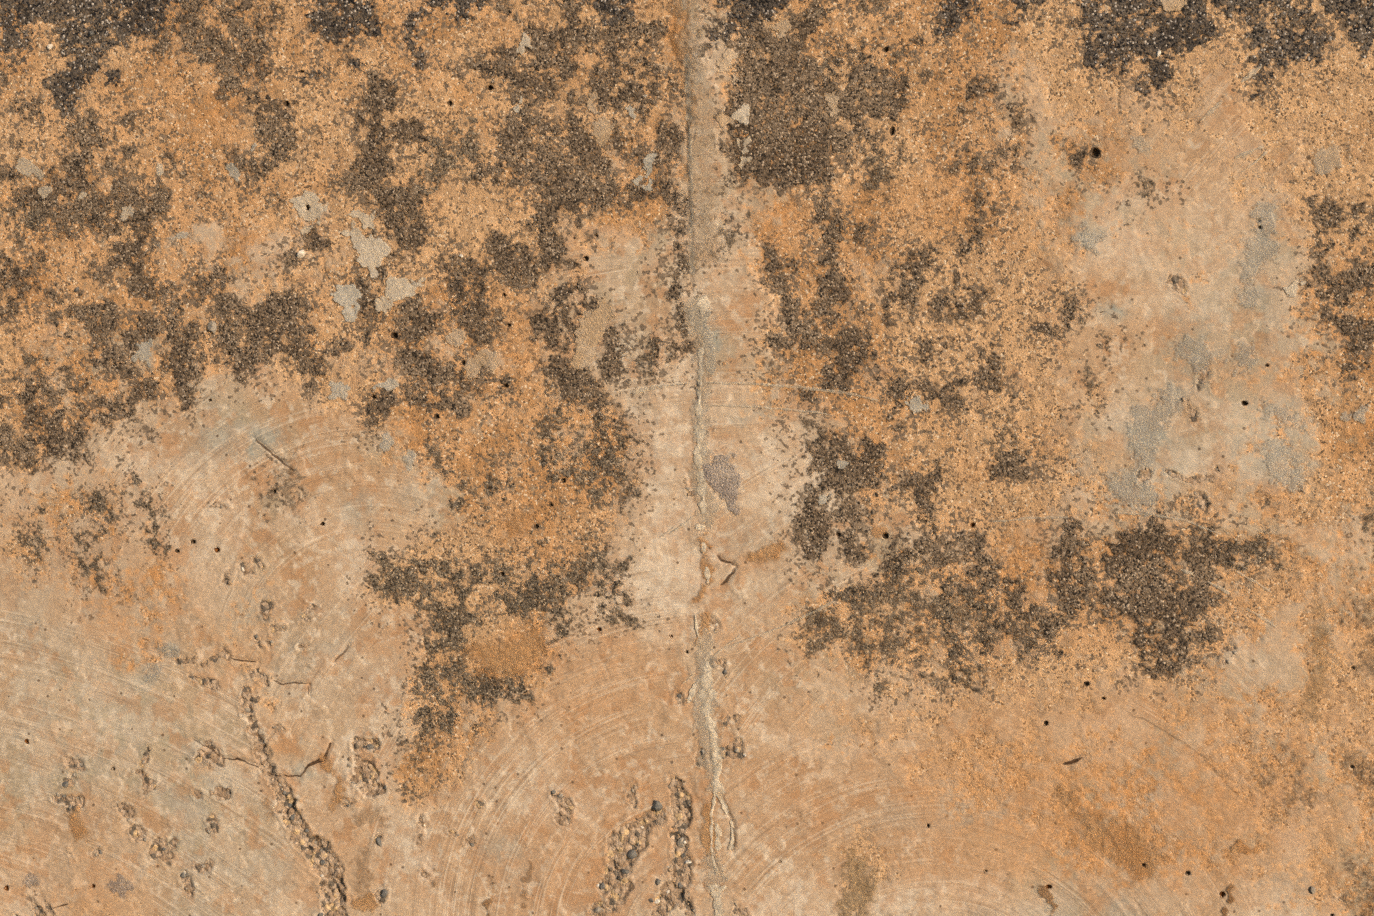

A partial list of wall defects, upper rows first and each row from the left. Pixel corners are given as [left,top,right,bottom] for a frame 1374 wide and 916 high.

crack [718,555,735,585]
spalling [238,667,348,916]
spalling [589,776,695,916]